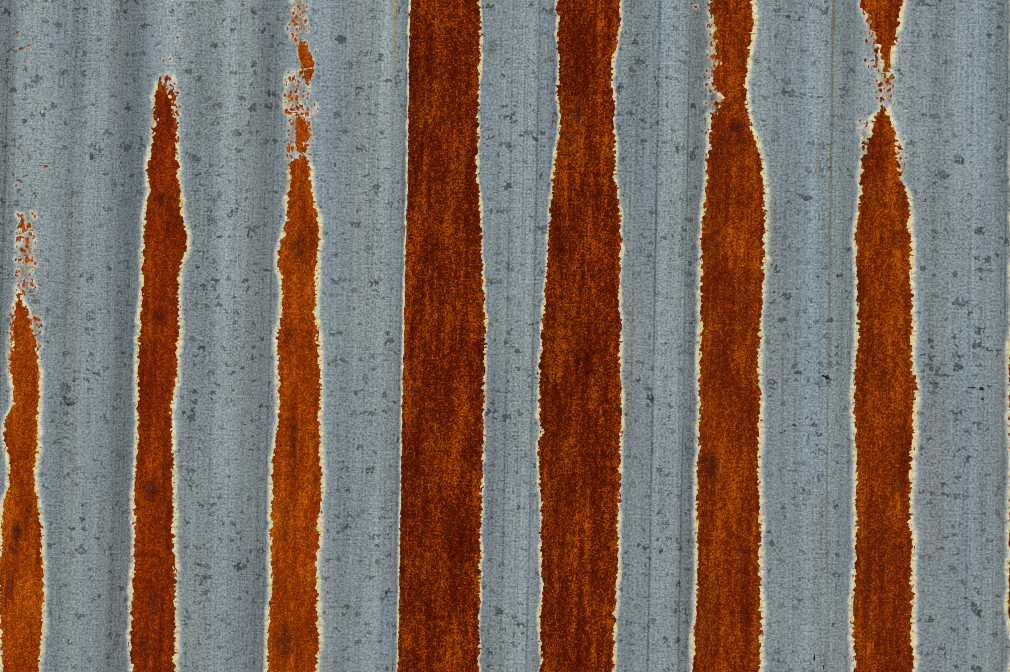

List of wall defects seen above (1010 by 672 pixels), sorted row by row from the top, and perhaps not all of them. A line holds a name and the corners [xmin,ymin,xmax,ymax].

corrosion [0,212,47,672]
corrosion [126,74,191,672]
corrosion [264,0,326,672]
corrosion [396,0,488,672]
corrosion [535,0,625,672]
corrosion [690,0,770,672]
corrosion [848,0,920,672]